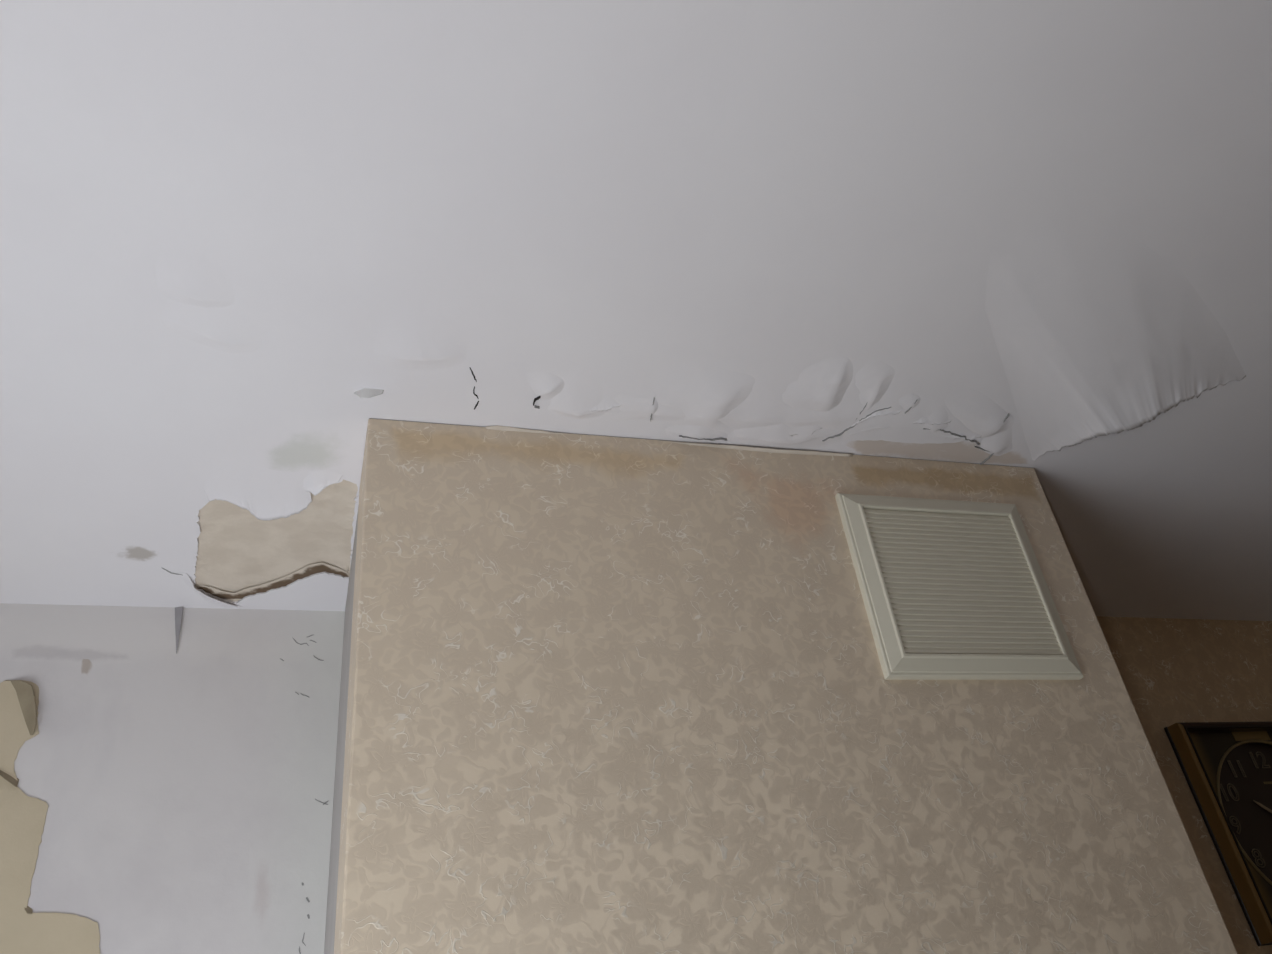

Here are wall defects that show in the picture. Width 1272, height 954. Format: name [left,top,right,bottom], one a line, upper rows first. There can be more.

peeling [179,463,358,608]
damp [253,413,367,478]
crack [470,368,479,410]
damp [383,422,1049,581]